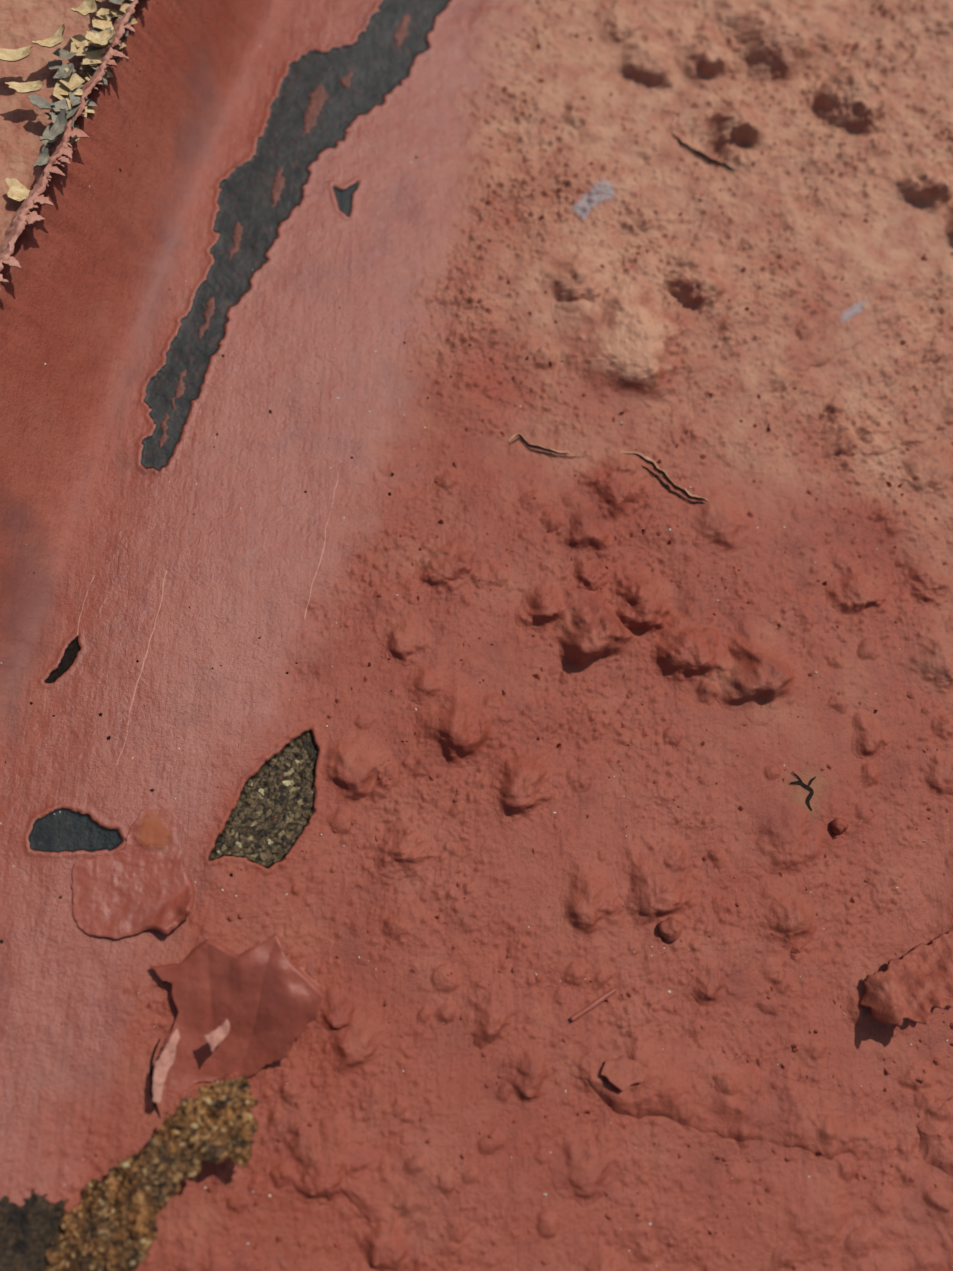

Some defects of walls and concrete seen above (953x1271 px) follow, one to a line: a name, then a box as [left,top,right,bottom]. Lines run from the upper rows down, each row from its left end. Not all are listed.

peeling [141,0,450,471]
peeling [44,636,81,683]
peeling [29,808,124,852]
spalling [0,934,324,1271]